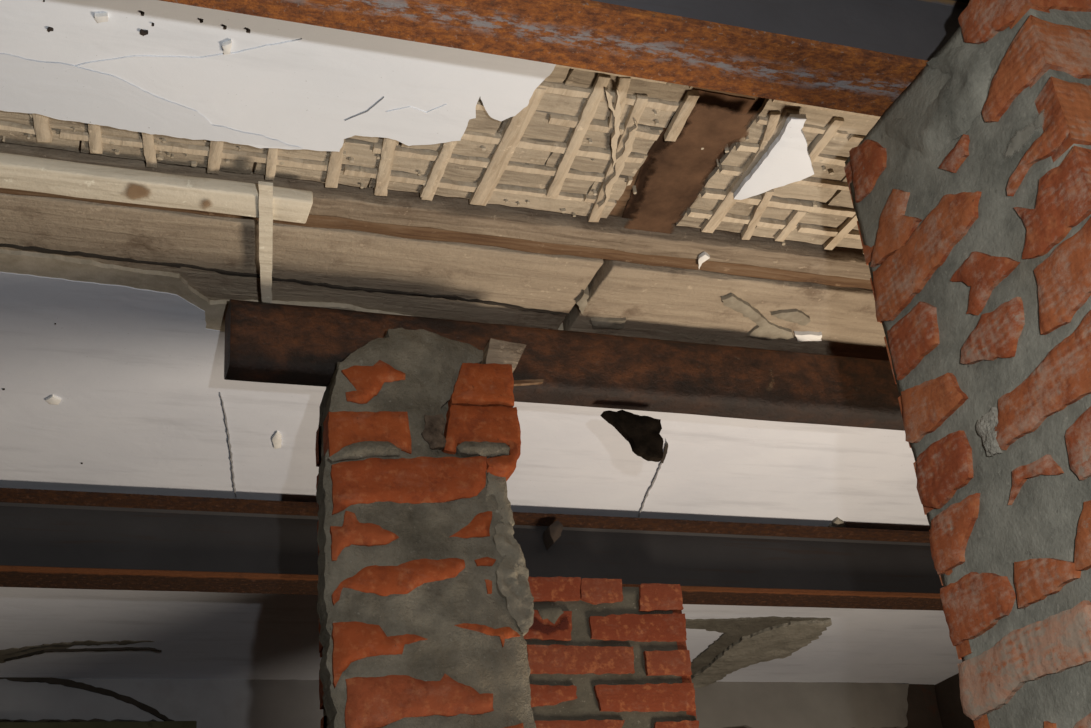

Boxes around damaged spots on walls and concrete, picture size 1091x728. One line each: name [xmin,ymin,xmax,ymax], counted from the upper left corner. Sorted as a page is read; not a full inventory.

peeling [0,54,303,149]
crack [345,97,447,121]
peeling [733,114,814,200]
spalling [976,407,1003,456]
flaking render [0,640,162,663]